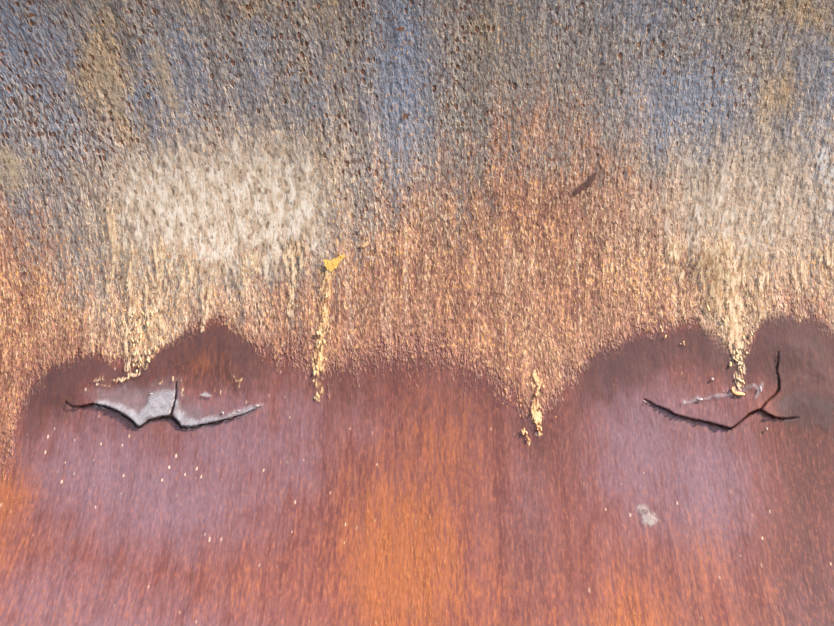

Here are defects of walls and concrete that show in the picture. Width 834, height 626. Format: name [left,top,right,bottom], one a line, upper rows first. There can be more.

leakage [586,117,834,396]
rust [312,270,336,402]
crack [64,395,260,428]
rust [521,370,544,445]
crack [647,362,795,430]